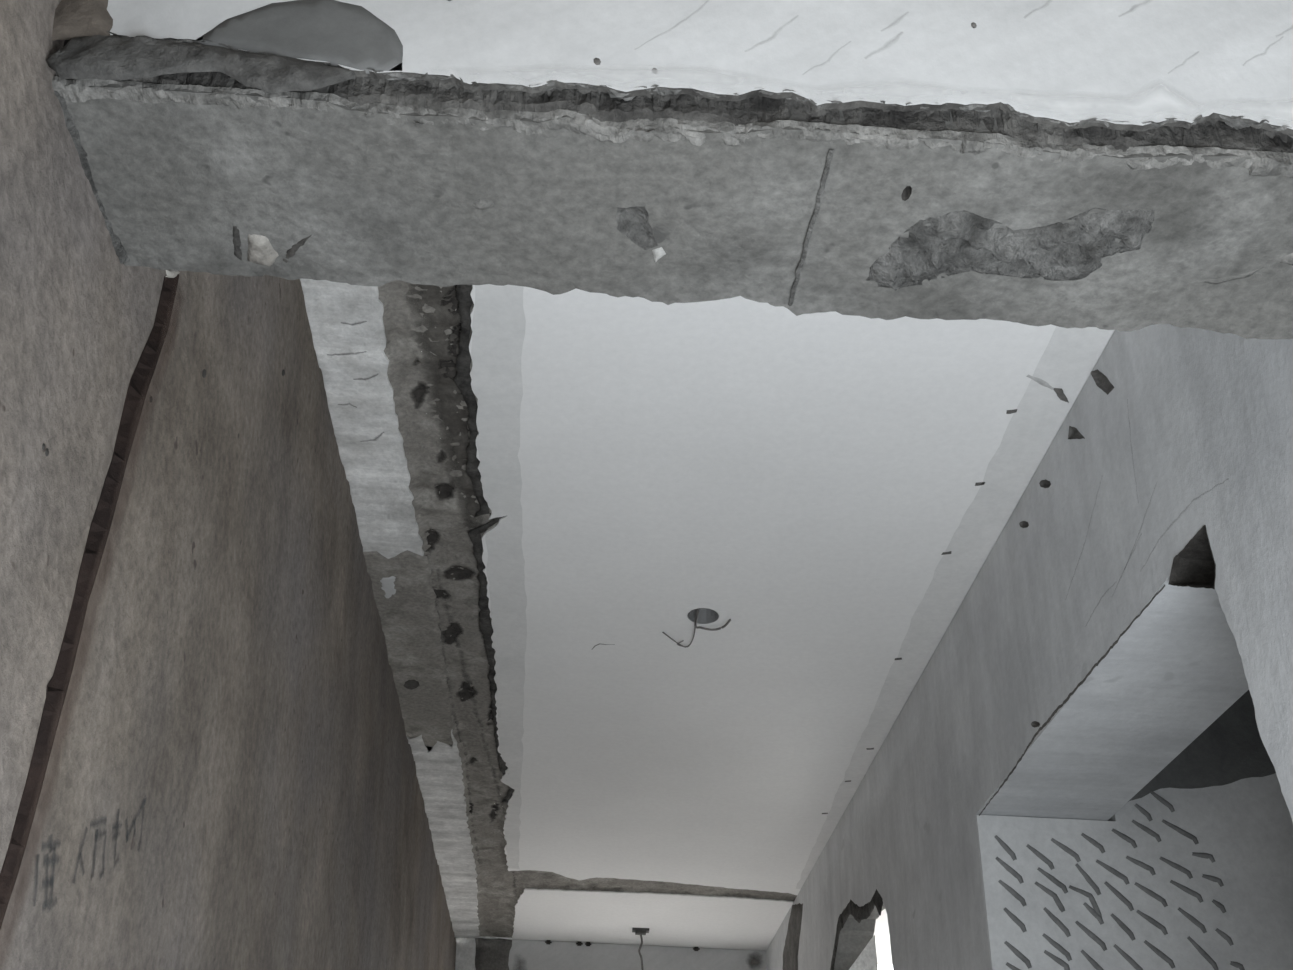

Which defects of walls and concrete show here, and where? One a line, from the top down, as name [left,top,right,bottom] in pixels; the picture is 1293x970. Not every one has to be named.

flaking render [46,0,1293,178]
spalling [233,226,311,267]
spalling [616,206,666,263]
spalling [866,207,1155,291]
peeling [363,280,803,970]
spalling [830,889,883,970]